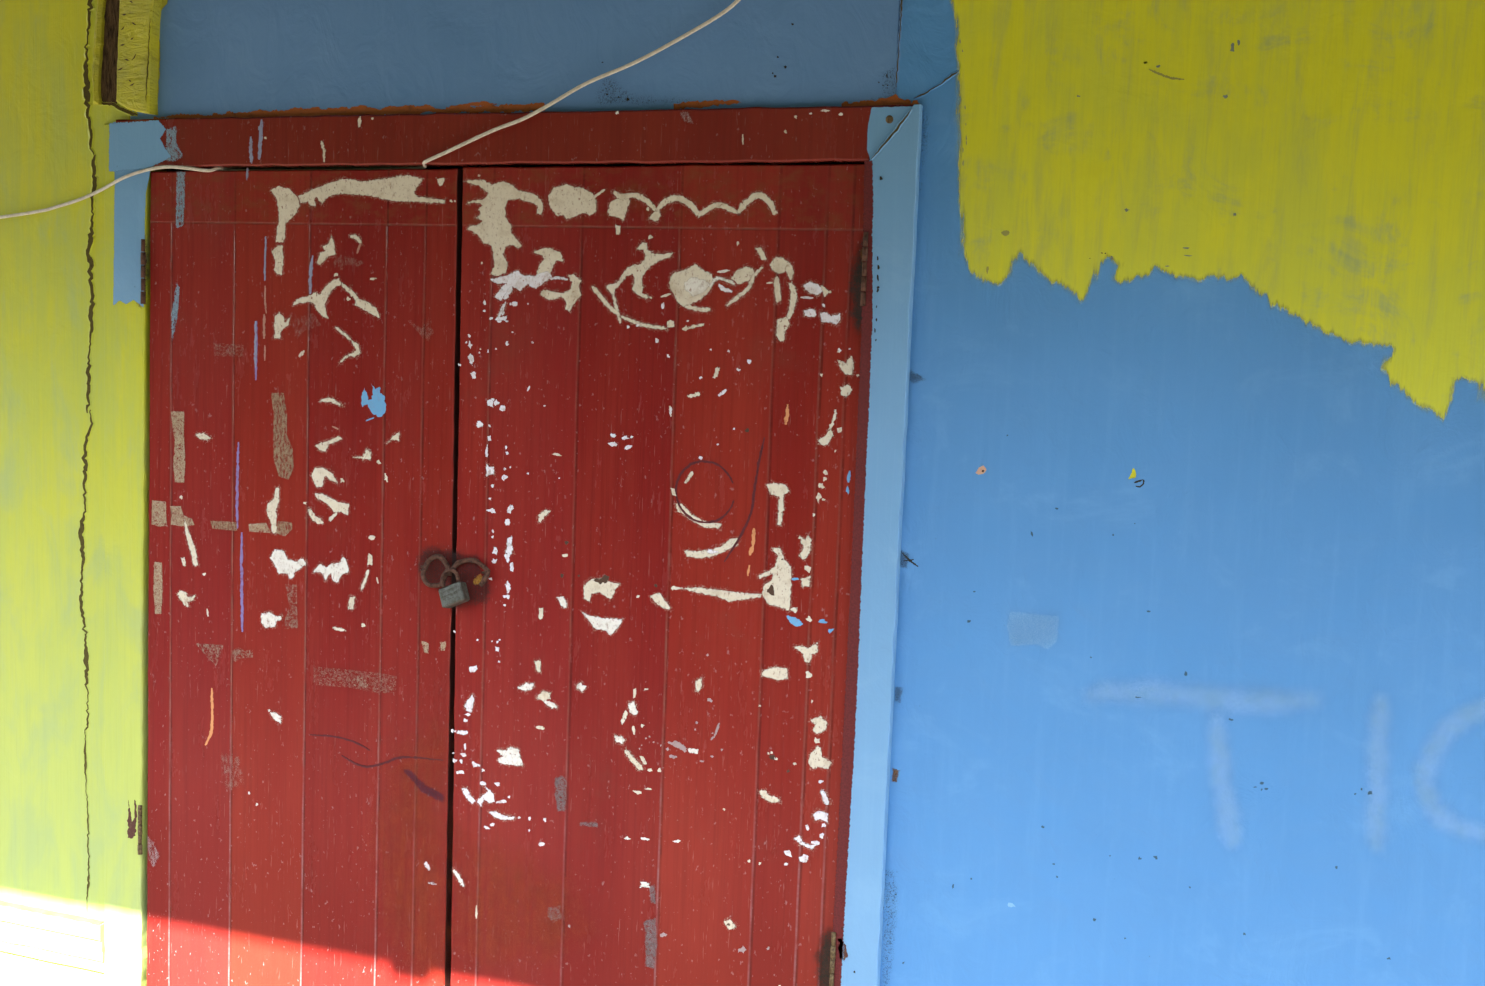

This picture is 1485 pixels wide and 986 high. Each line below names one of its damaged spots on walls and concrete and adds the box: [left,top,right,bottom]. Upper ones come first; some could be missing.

peeling [269,173,843,379]
crack [77,0,153,918]
peeling [151,393,379,631]
peeling [451,693,546,846]
peeling [476,398,529,606]
peeling [517,658,558,708]
peeling [538,541,624,636]
peeling [614,688,723,794]
peeling [636,456,828,622]
peeling [759,641,820,682]
peeling [768,700,834,865]
peeling [818,348,859,452]